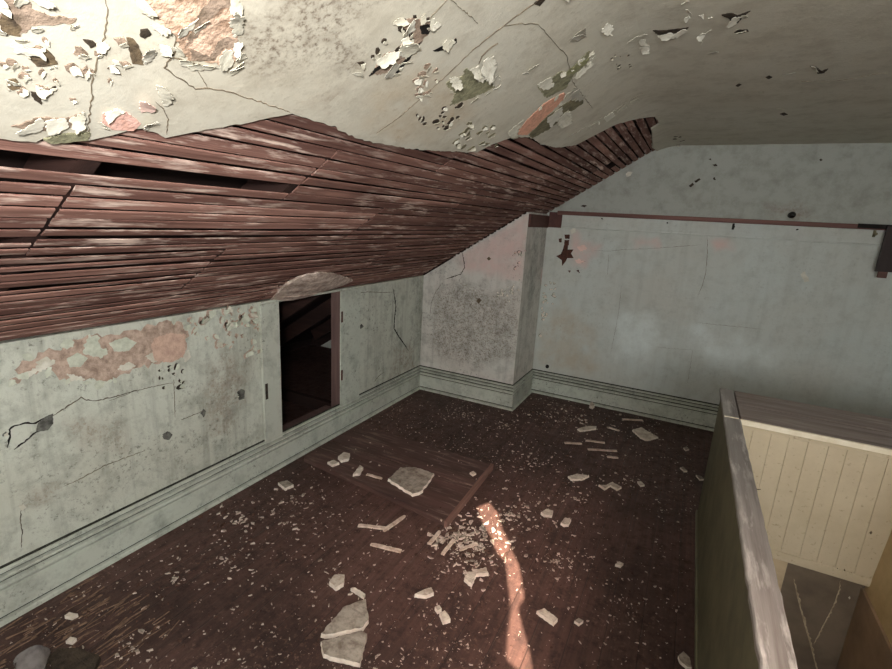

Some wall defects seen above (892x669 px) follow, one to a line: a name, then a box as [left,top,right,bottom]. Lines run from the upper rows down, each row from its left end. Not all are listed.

peeling [11,98,91,144]
crack [87,0,109,139]
flaking render [0,0,247,105]
crack [157,17,290,113]
peeling [352,13,441,79]
peeling [412,43,501,152]
crack [376,0,591,134]
flaking render [508,50,595,139]
flaking render [8,305,262,390]
crack [361,289,408,350]
leakage [388,212,529,380]
crack [18,504,26,547]